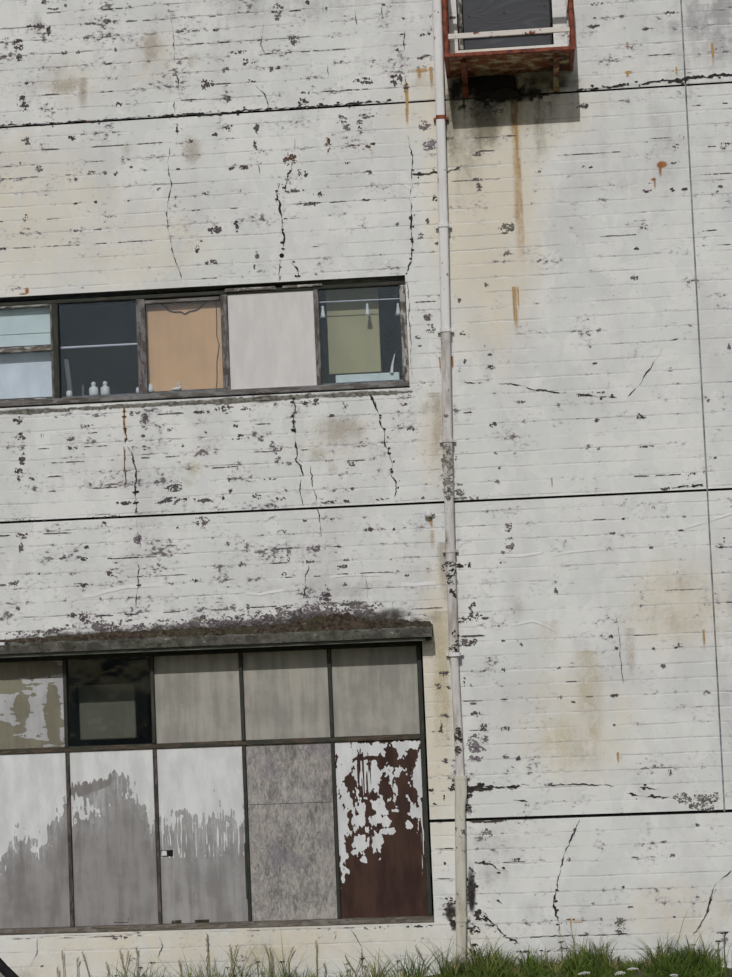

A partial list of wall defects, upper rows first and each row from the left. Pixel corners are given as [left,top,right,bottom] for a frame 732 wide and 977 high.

peeling [27,0,67,35]
damp [447,74,565,141]
crack [0,22,406,279]
crack [290,397,321,532]
crack [369,393,400,497]
peeling [441,561,471,598]
damp [153,612,321,630]
damp [353,609,403,620]
peeling [448,602,489,653]
peeling [432,700,489,763]
crack [484,820,628,947]
crack [693,871,731,934]